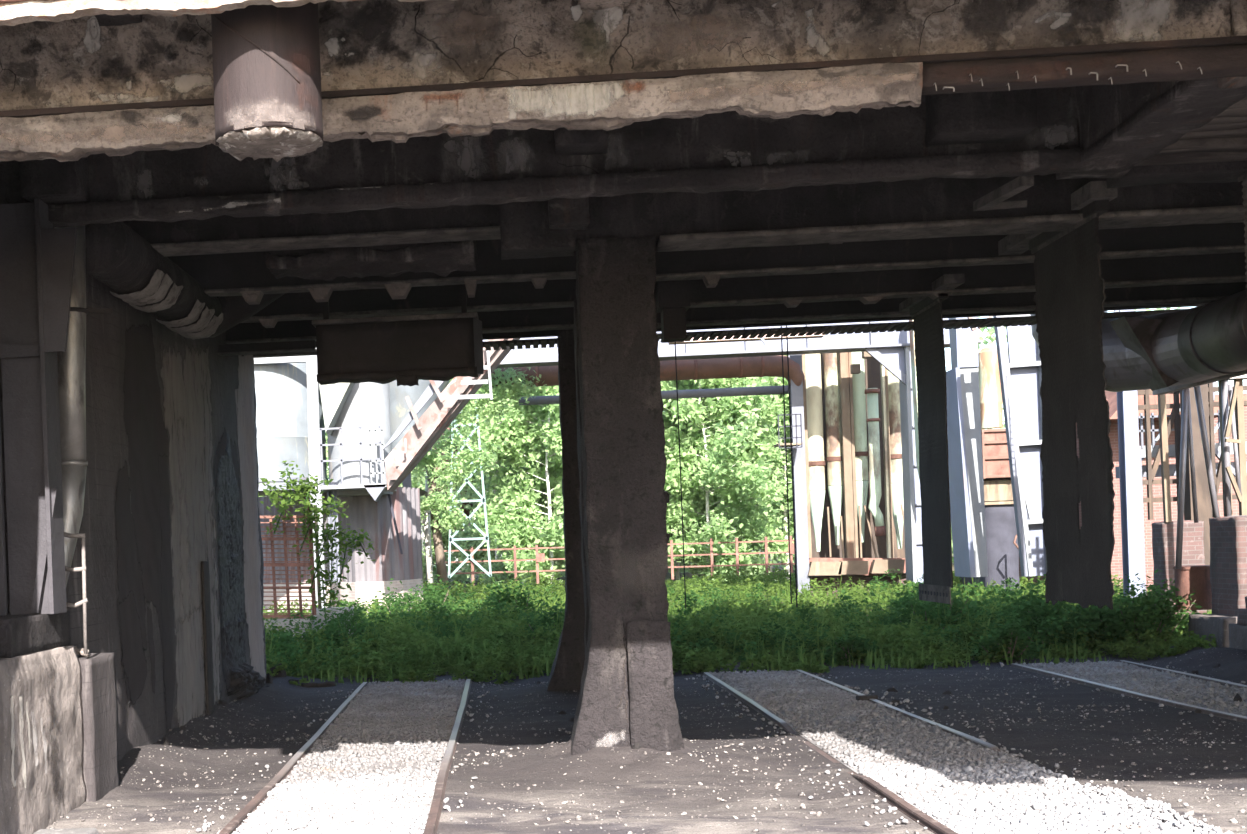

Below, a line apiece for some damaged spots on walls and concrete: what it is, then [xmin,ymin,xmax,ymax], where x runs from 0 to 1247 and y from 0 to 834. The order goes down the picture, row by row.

crack [414,5,546,83]
crack [609,16,634,73]
damp [962,0,1021,43]
damp [1035,0,1216,44]